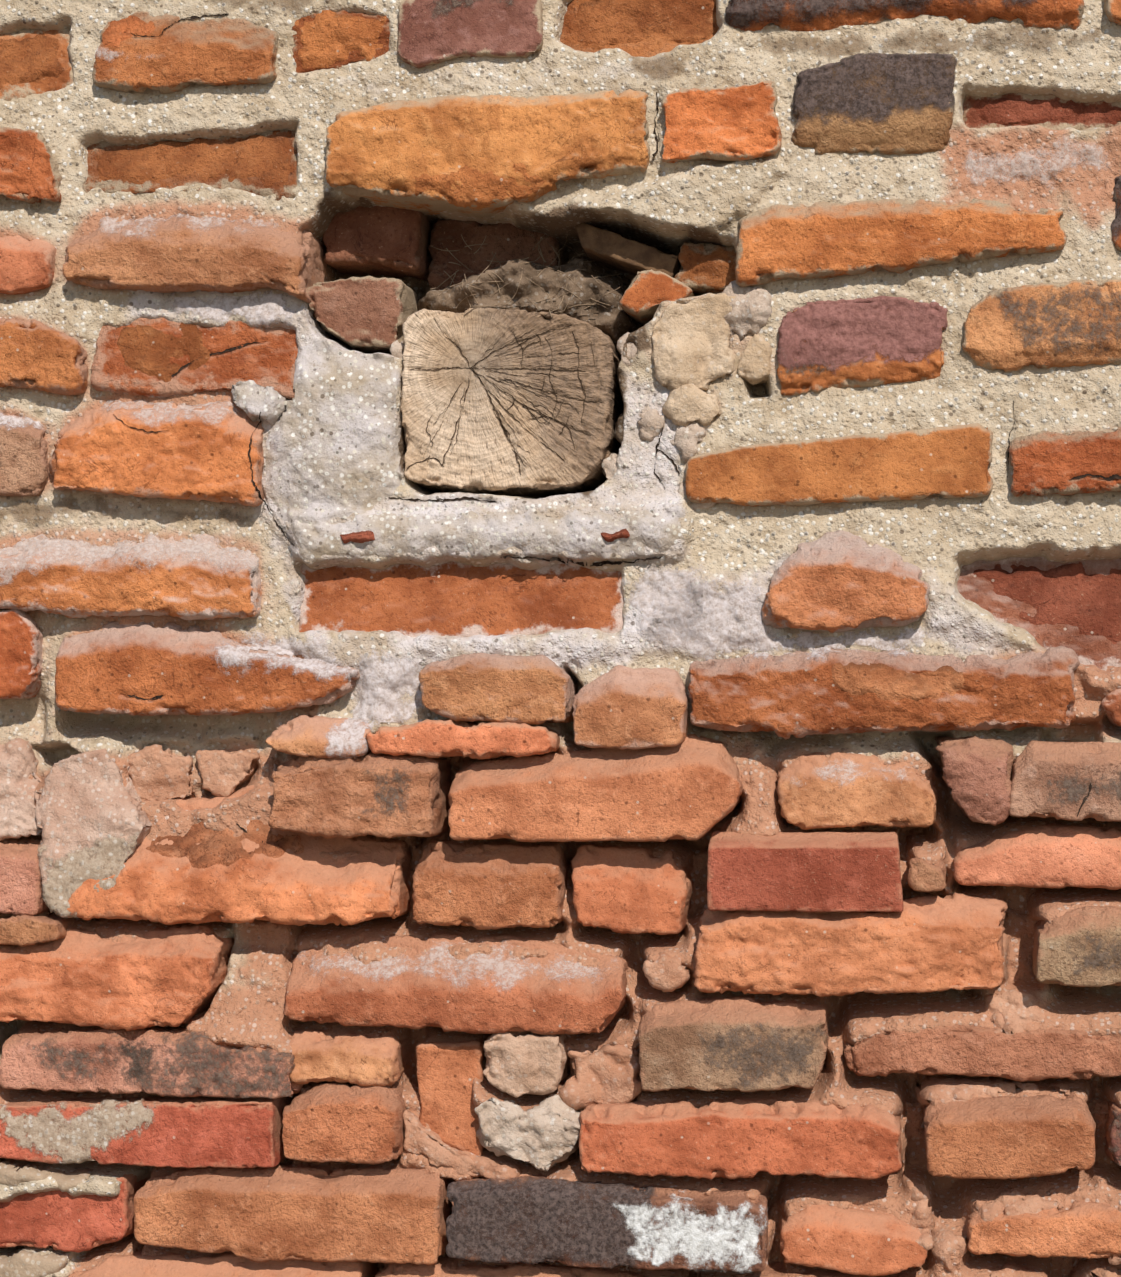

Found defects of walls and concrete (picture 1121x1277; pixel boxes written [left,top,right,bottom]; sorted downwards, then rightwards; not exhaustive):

crack [125,14,228,37]
crack [171,341,264,377]
crack [248,412,294,546]